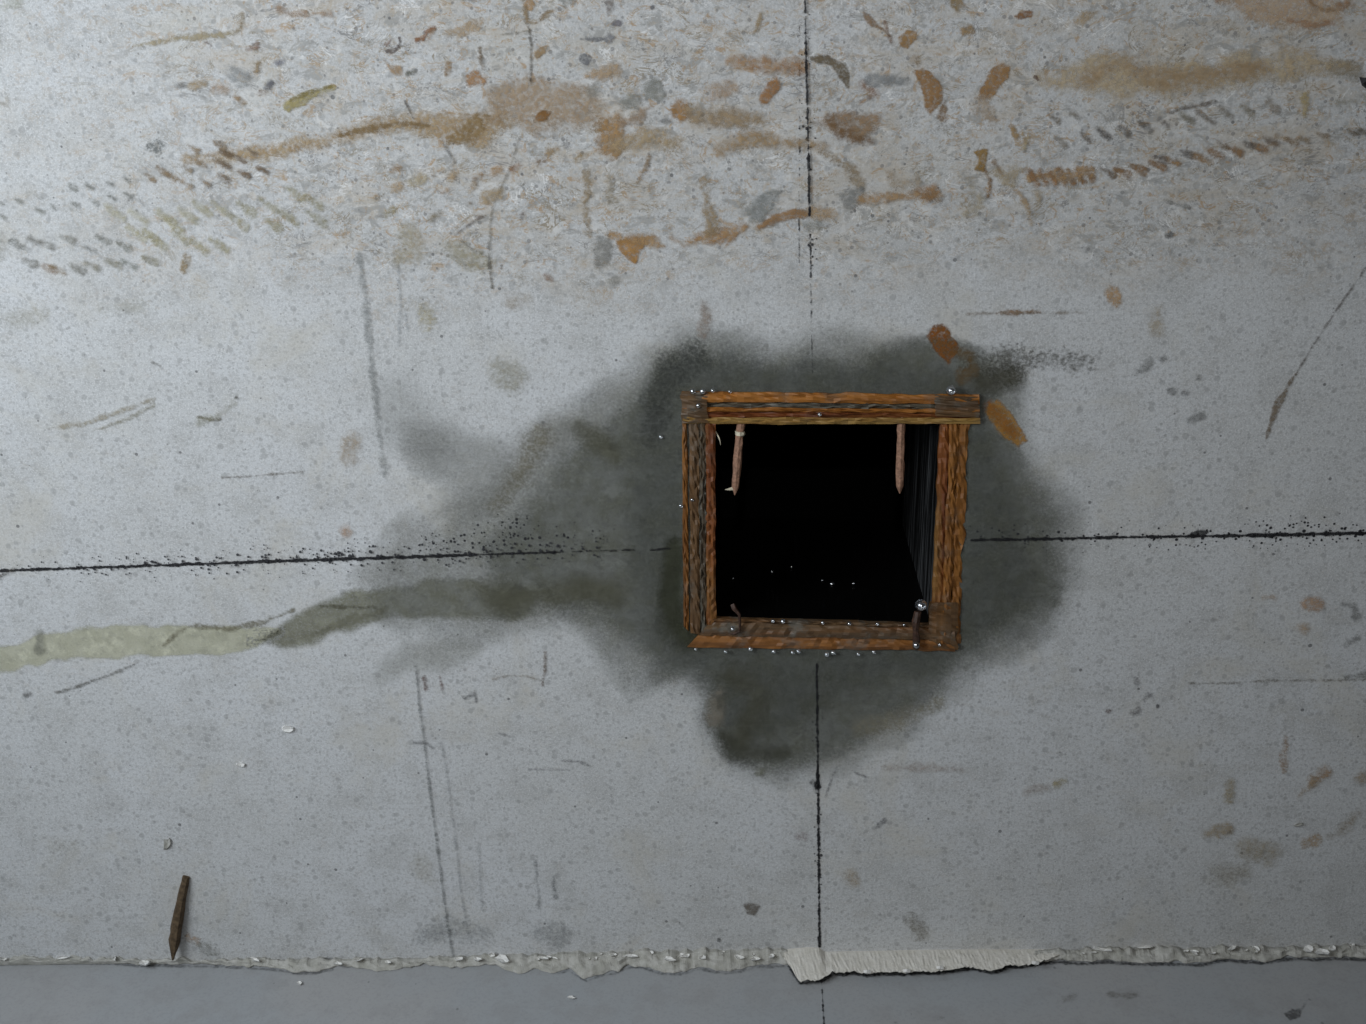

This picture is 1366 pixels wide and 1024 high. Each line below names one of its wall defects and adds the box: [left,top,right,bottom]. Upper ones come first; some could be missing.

rust [927,324,975,383]
rust [987,400,1027,446]
leakage [0,341,1085,762]
peeling [735,947,1059,984]